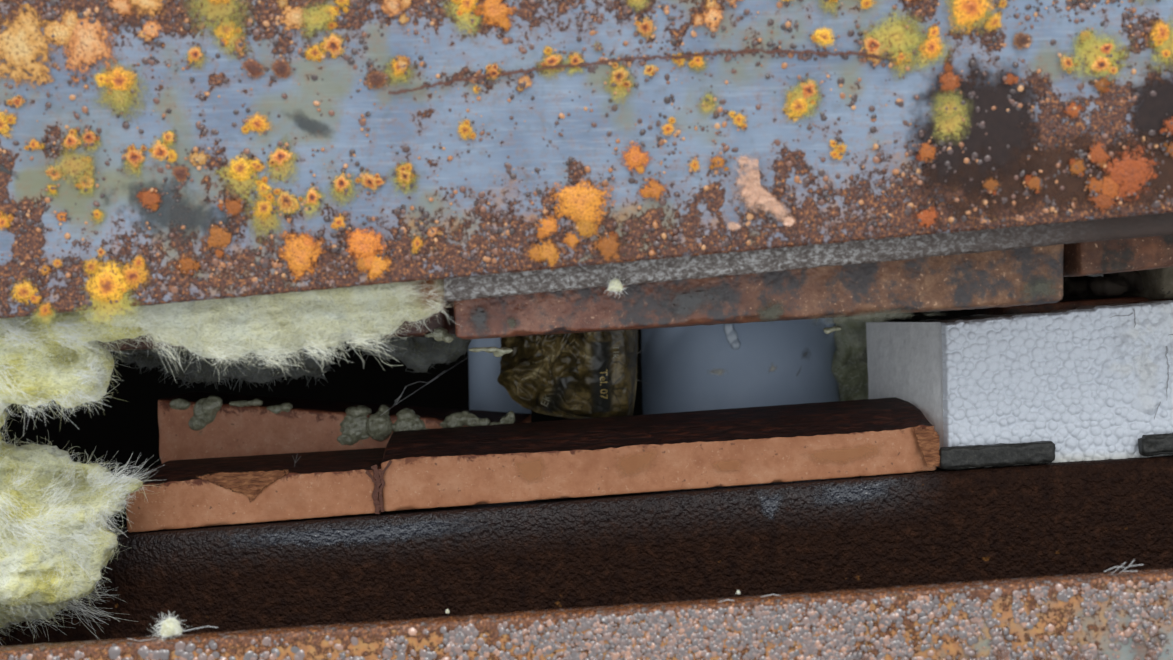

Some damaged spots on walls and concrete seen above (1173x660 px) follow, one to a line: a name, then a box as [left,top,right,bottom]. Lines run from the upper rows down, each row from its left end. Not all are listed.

rust [0,0,1173,326]
crack [1154,334,1173,419]
rust [8,651,90,660]
rust [108,637,305,660]
rust [325,579,1173,660]